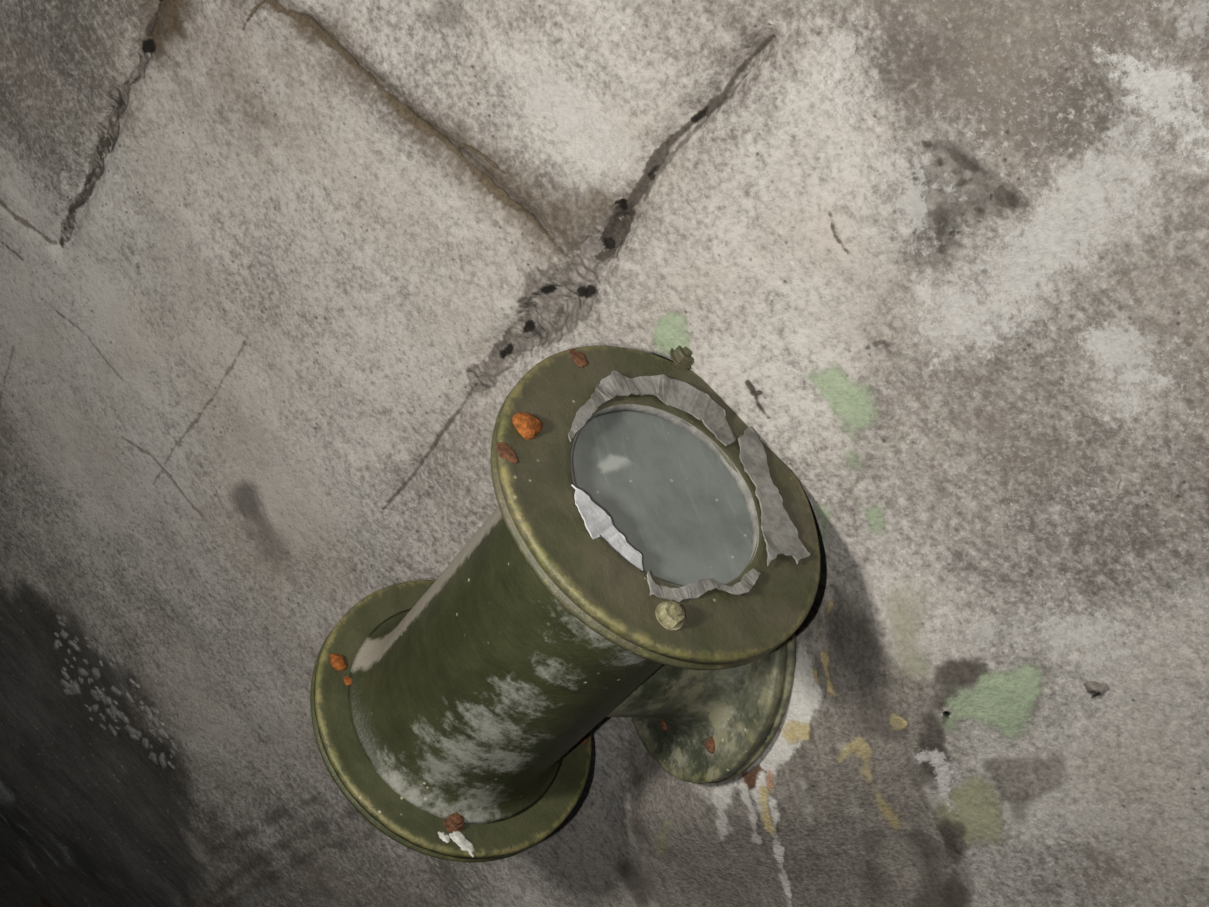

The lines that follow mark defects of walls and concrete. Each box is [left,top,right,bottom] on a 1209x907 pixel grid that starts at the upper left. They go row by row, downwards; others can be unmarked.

crack [59,0,162,247]
crack [242,0,563,253]
crack [541,35,772,298]
spalling [937,149,975,186]
spalling [994,186,1017,211]
crack [500,321,535,359]
crack [745,380,769,419]
peeling [948,664,1042,737]
water stain [623,592,1131,907]
peeling [941,779,1000,841]